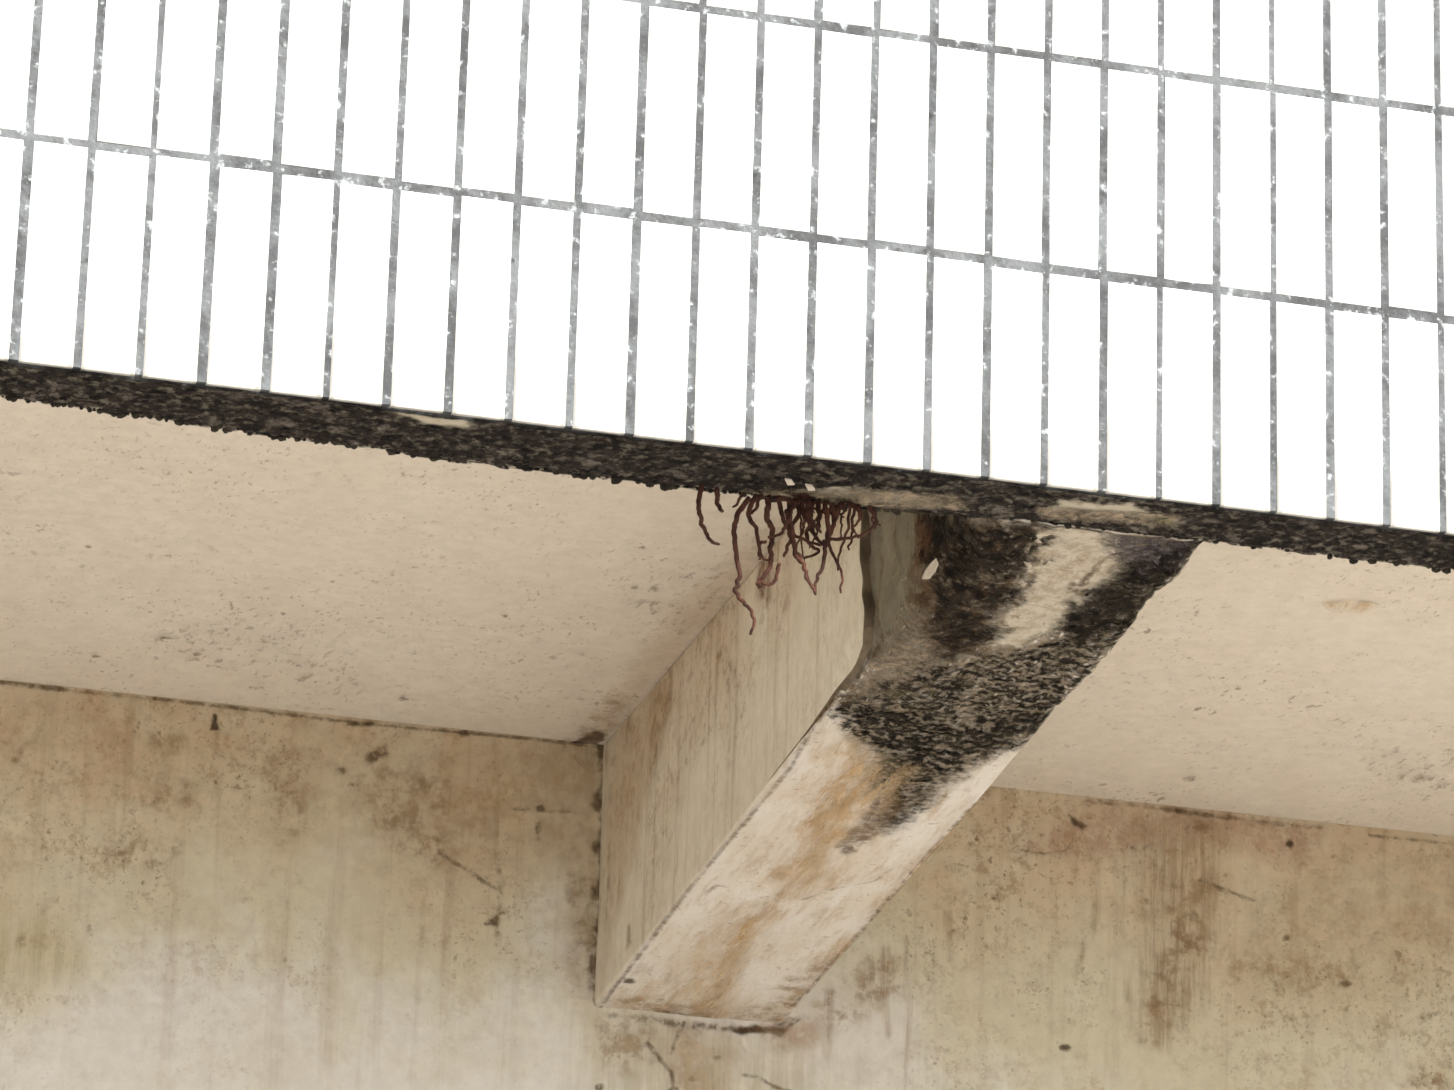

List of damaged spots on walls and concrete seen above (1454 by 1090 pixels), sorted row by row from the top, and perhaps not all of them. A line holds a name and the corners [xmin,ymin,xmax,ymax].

water stain [0,362,1454,853]
water stain [588,881,600,1001]
crack [647,1024,684,1090]